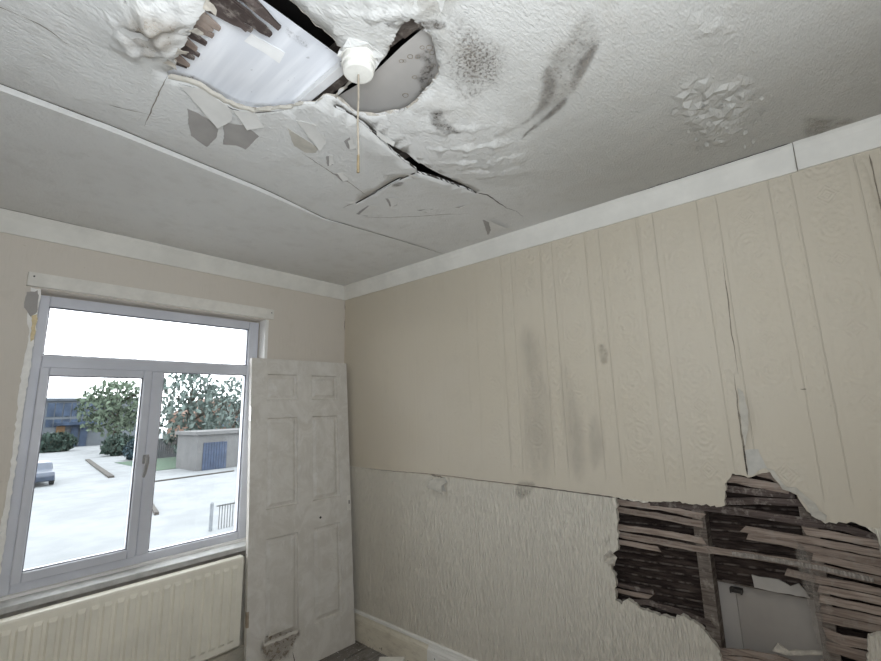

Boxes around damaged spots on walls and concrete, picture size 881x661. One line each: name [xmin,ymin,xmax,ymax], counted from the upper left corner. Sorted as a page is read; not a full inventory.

crack [1,79,515,250]
leakage [576,49,594,77]
peeling [668,73,766,150]
spalling [604,468,881,661]